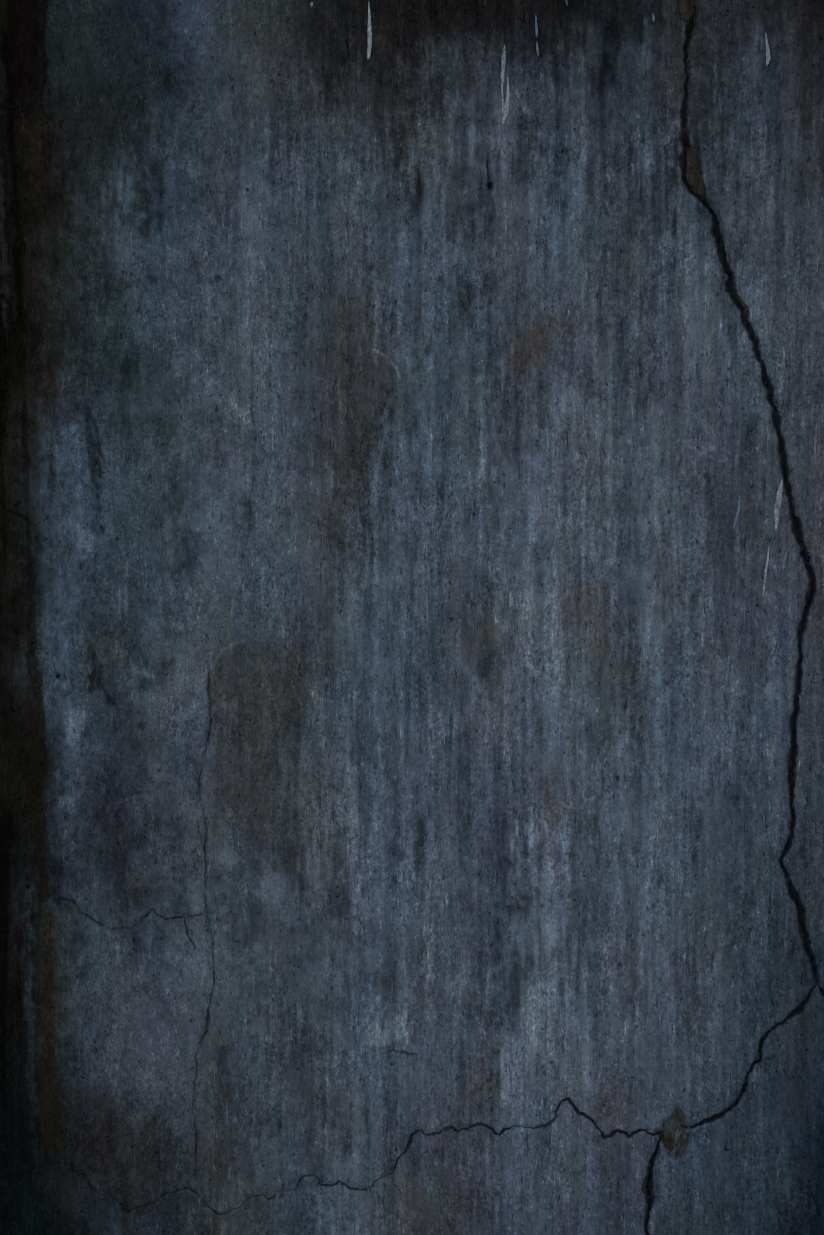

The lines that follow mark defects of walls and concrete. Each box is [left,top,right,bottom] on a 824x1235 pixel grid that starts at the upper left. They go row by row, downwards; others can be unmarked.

crack [7,262,663,1235]
spalling [654,1103,693,1162]
crack [677,5,824,1129]